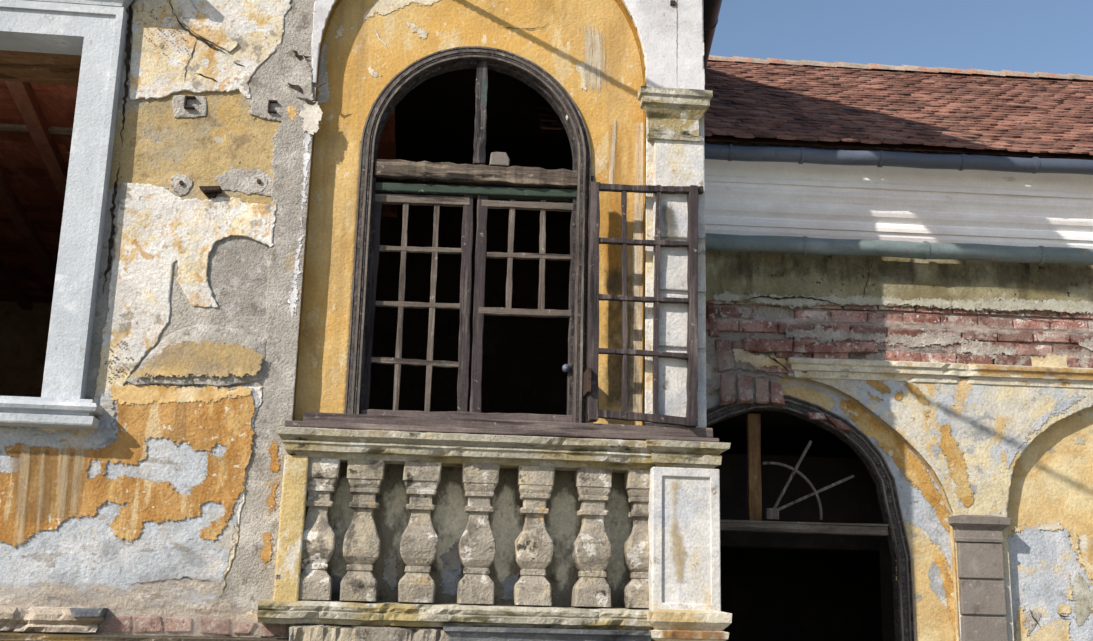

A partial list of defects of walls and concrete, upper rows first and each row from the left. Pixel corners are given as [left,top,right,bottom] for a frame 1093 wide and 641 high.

crack [169,0,243,81]
crack [103,0,134,291]
peeling [0,0,438,638]
damp [778,256,915,283]
flaking render [706,290,1093,532]
peeling [903,519,956,641]
peeling [1008,521,1093,641]